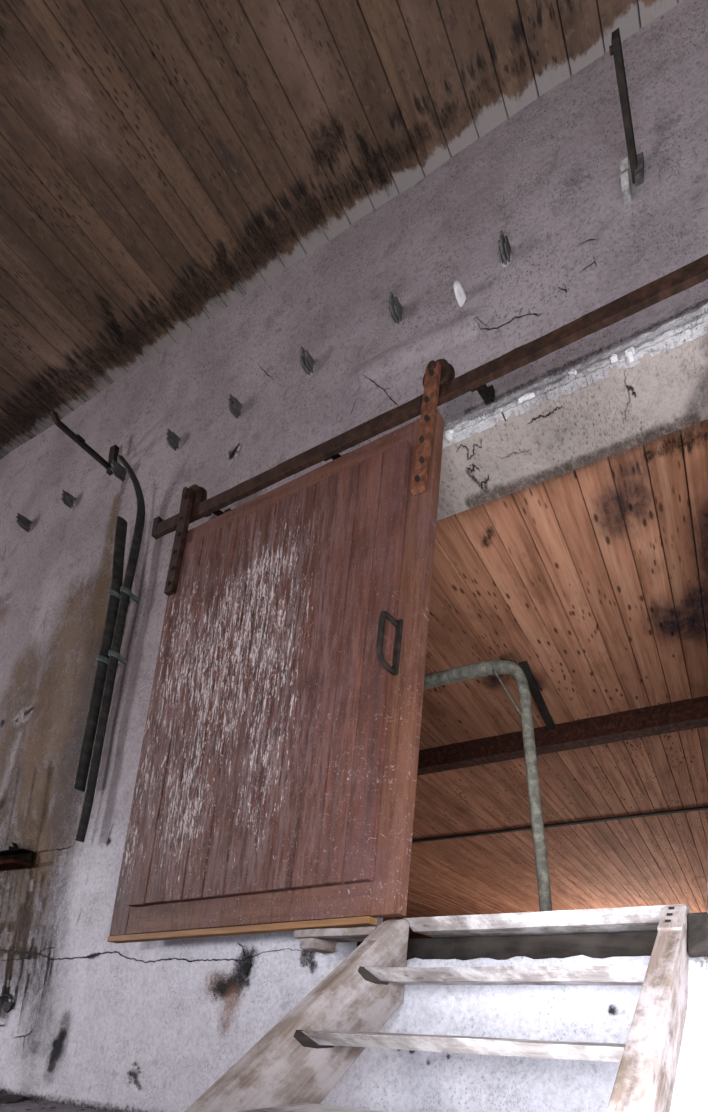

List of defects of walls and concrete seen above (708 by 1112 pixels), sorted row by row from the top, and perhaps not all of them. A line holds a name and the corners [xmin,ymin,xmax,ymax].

leakage [0,104,452,458]
spalling [442,299,708,449]
leakage [0,491,123,1052]
crack [0,942,308,963]